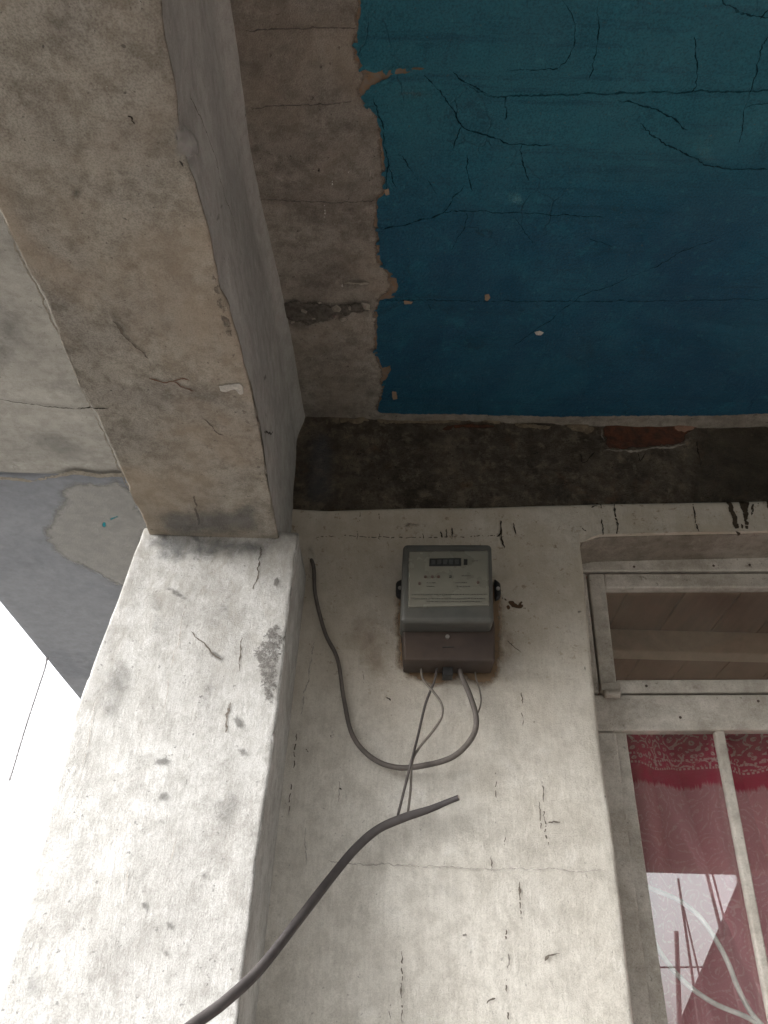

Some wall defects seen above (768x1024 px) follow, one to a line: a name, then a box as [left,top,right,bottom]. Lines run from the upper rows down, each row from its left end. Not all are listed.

crack [246,0,768,250]
peeling [352,0,424,410]
crack [1,399,107,409]
crack [113,321,193,391]
spalling [219,383,243,395]
spalling [604,425,690,449]
damp [697,426,768,536]
crack [253,547,262,589]
crack [164,604,242,708]
crack [289,734,599,1021]